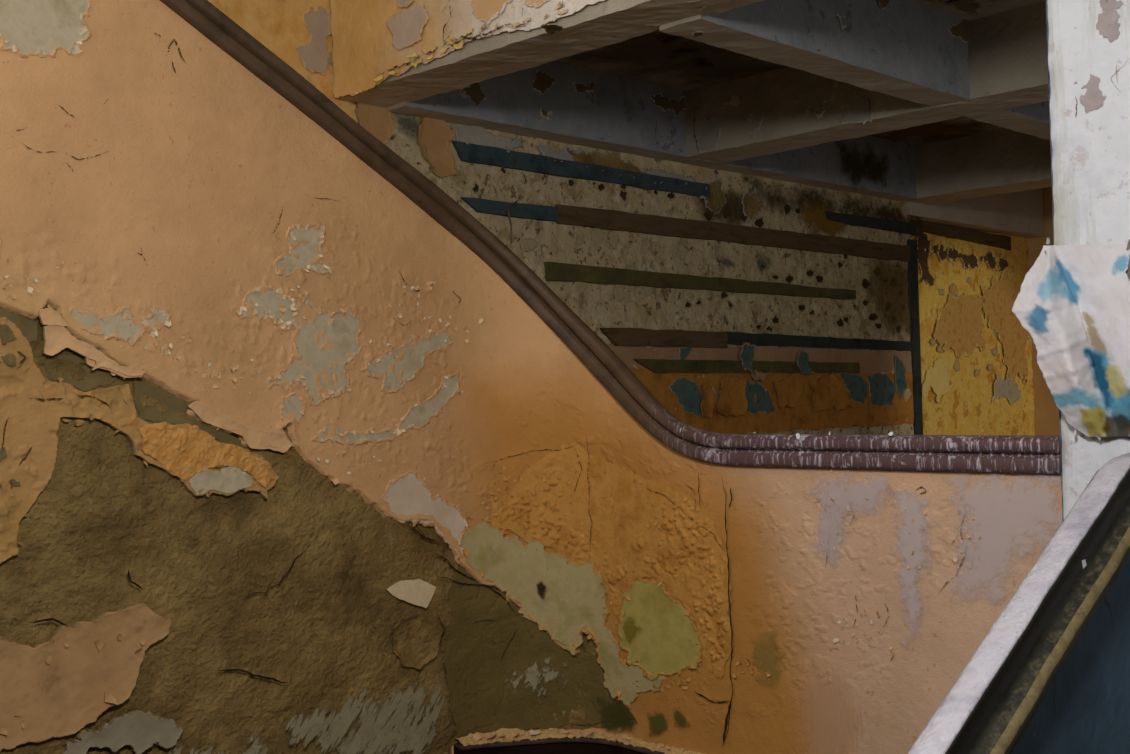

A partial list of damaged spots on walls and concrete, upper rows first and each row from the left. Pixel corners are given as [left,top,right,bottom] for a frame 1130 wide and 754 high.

peeling [0,0,92,58]
peeling [355,0,568,145]
flaking render [759,263,823,285]
peeling [839,355,908,407]
peeling [922,339,960,404]
peeling [1012,238,1130,441]
flaking render [0,220,709,754]
crack [647,475,733,746]
water stain [818,478,931,645]